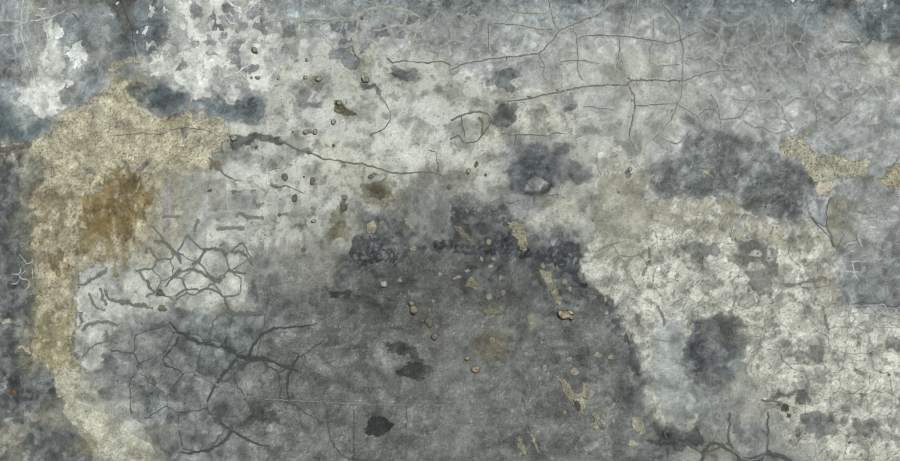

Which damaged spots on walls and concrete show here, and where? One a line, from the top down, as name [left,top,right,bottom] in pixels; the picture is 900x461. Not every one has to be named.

spalling [0,0,283,461]
crack [71,157,443,461]
damp [85,169,703,461]
damp [112,0,900,142]
crack [285,0,867,179]
crack [596,236,676,342]
damp [597,84,813,264]
damp [682,232,782,388]
peeling [579,145,900,461]
crack [647,197,845,461]
spalling [778,129,871,182]
damp [835,181,900,353]